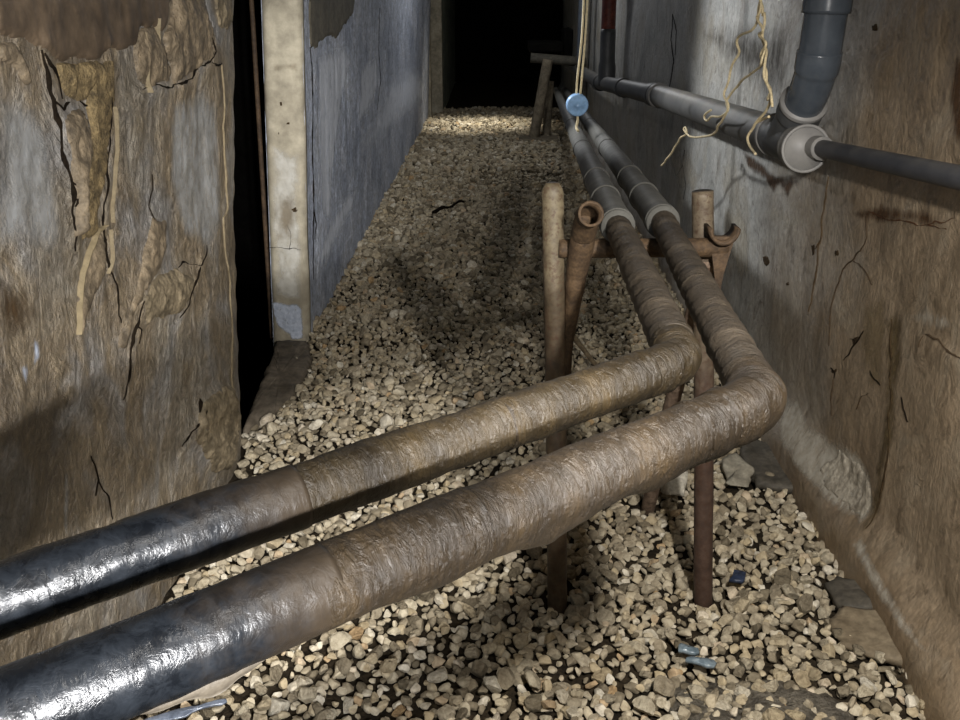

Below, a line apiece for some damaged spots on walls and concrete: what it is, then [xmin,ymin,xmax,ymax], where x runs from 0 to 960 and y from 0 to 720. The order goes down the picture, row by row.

peeling [309,0,355,49]
crack [143,38,222,90]
crack [41,50,88,252]
peeling [0,0,233,332]
crack [101,98,145,400]
crack [178,245,208,318]
crack [808,177,952,416]
crack [918,334,960,358]
crack [90,456,113,519]